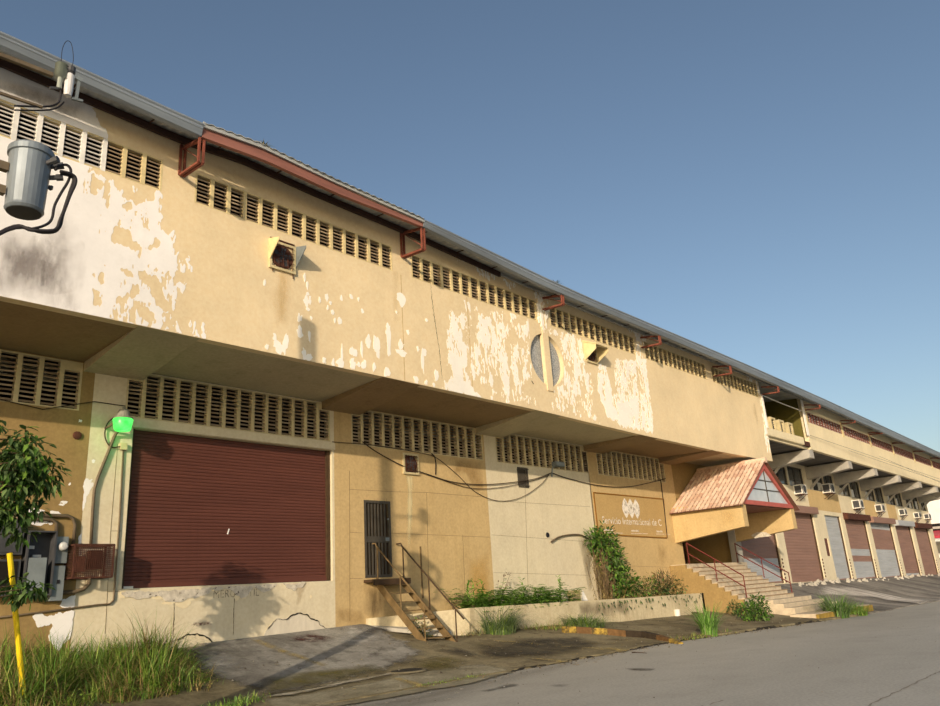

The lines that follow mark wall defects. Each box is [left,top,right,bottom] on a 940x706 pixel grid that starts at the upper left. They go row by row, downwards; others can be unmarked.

peeling [0,67,108,139]
peeling [0,136,206,339]
peeling [265,273,653,433]
peeling [32,595,76,650]
crack [160,607,212,647]
spalling [118,581,312,608]
crack [268,612,325,628]